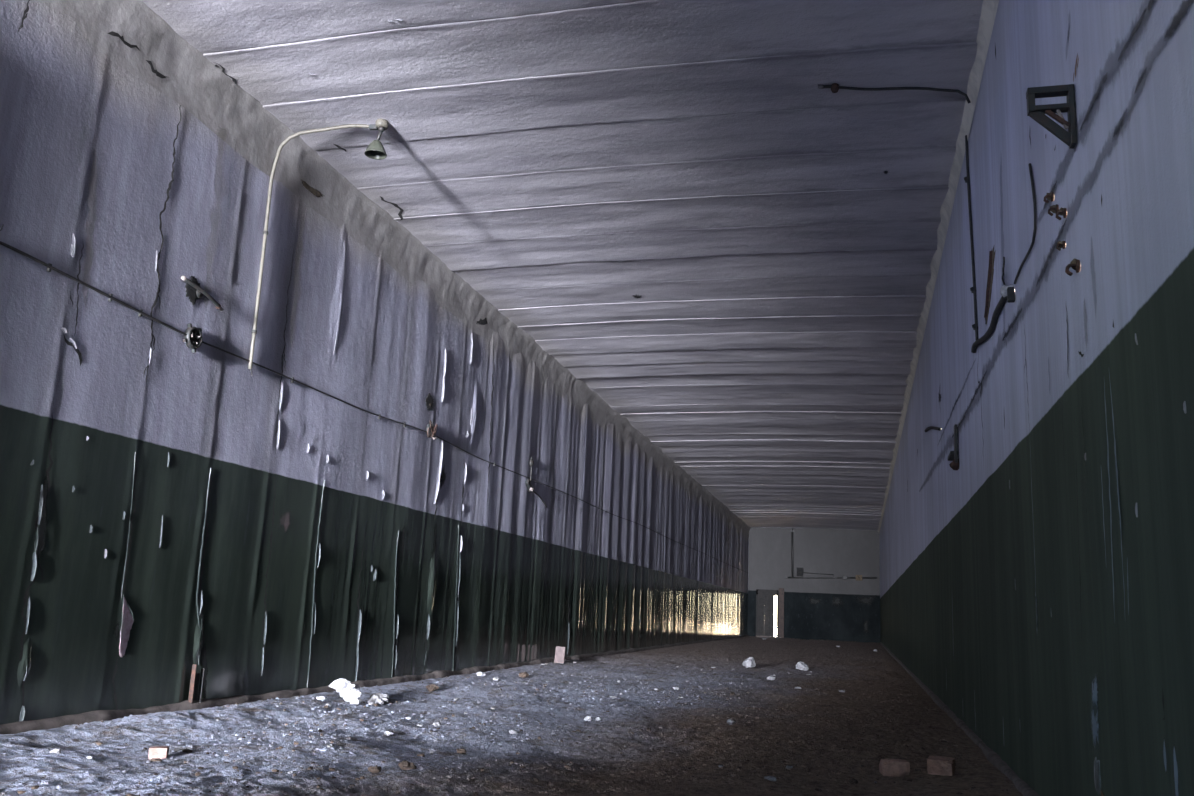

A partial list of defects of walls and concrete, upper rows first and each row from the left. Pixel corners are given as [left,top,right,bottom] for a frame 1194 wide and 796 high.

crack [144,105,181,385]
peeling [112,453,138,710]